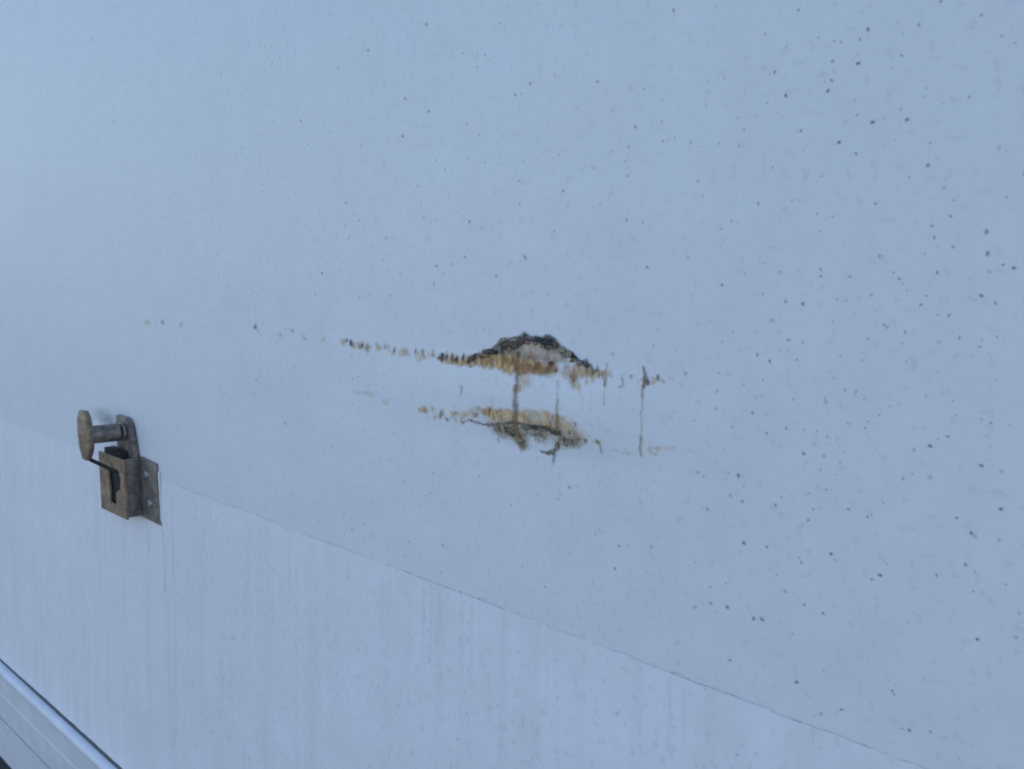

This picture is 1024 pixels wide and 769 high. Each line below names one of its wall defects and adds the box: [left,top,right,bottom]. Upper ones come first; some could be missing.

rust [415,350,600,448]
peeling [468,333,590,372]